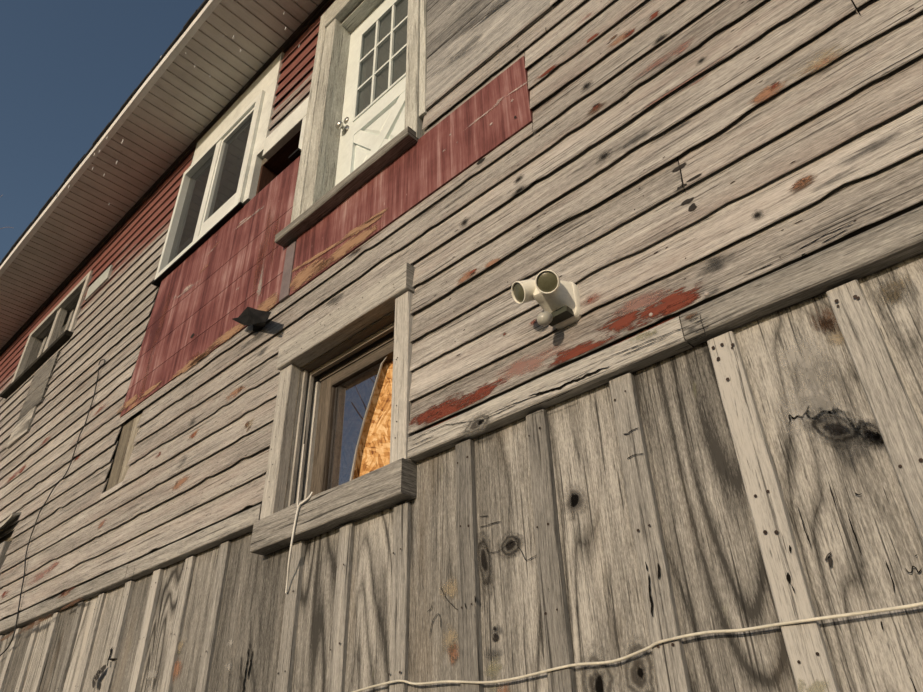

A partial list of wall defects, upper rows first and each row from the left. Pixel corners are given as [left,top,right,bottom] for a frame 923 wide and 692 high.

peeling [292,209,387,272]
peeling [190,324,244,365]
peeling [257,294,278,311]
peeling [548,281,702,368]
peeling [409,378,507,431]
crack [411,315,708,446]
crack [788,406,873,428]